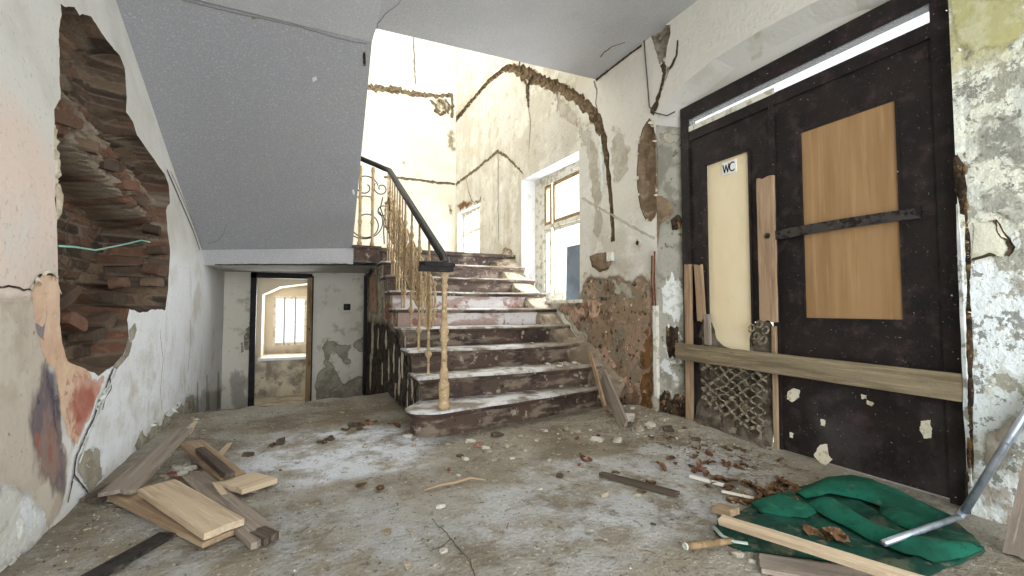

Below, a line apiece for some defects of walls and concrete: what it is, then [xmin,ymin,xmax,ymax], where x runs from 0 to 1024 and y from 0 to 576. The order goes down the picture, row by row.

peeling [945,0,1024,60]
crack [182,0,642,242]
spalling [551,25,682,246]
crack [0,271,57,291]
spalling [0,4,170,528]
peeling [565,252,639,341]
spalling [953,106,1024,498]
leakage [31,365,104,494]
crack [67,367,119,503]